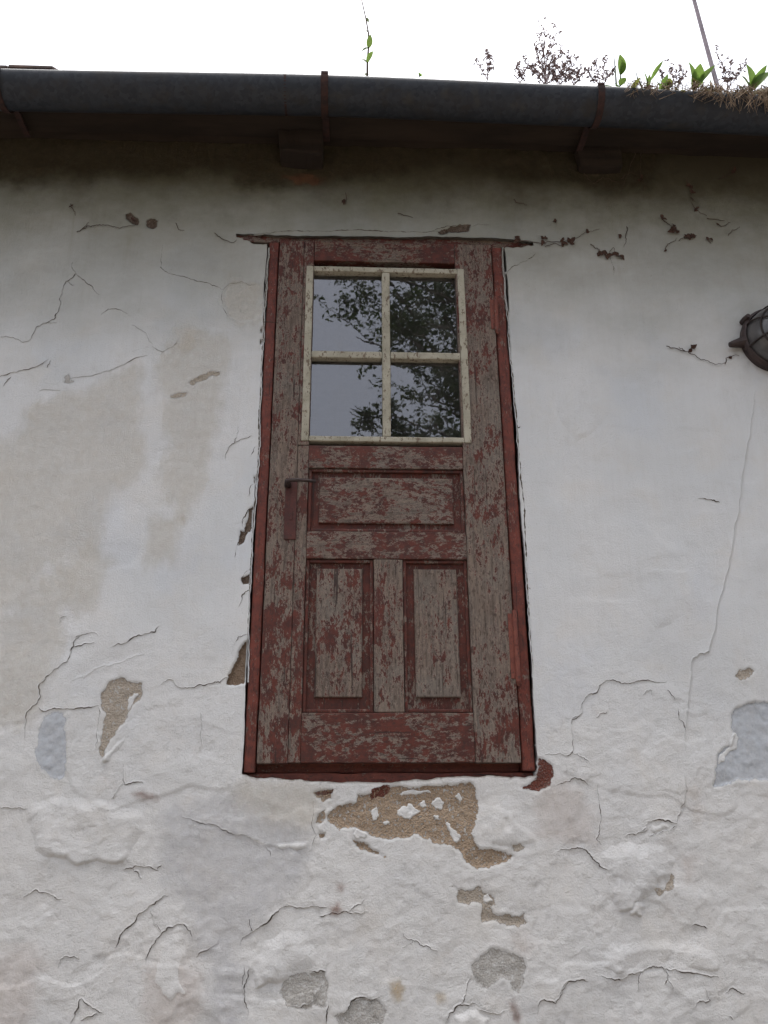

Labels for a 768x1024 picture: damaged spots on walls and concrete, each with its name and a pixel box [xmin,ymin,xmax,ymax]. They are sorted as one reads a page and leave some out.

crack [0,262,178,391]
crack [23,615,159,738]
spalling [226,642,246,685]
crack [545,391,755,870]
peeling [99,677,143,757]
spalling [523,758,554,791]
spalling [314,782,524,869]
crack [70,998,102,1023]
crack [115,864,369,1016]
spalling [457,886,526,927]
spalling [472,948,526,993]
crack [537,964,745,1020]